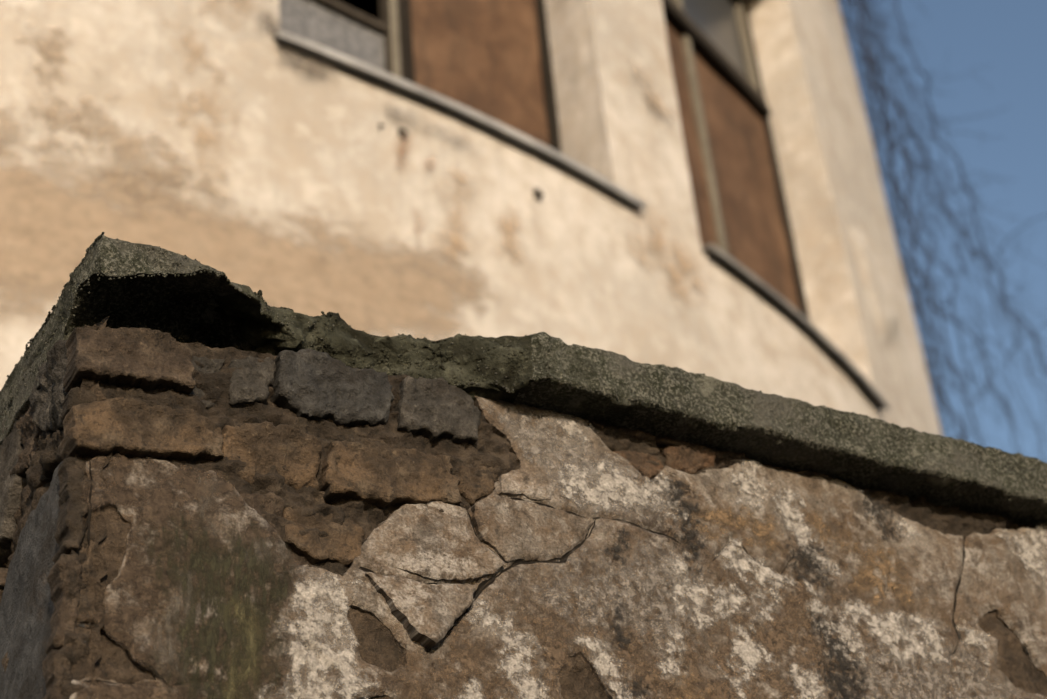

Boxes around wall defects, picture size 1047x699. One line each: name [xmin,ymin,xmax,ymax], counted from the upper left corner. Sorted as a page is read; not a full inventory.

flaking render [42,325,1047,699]
crack [425,496,680,652]
crack [950,536,983,678]